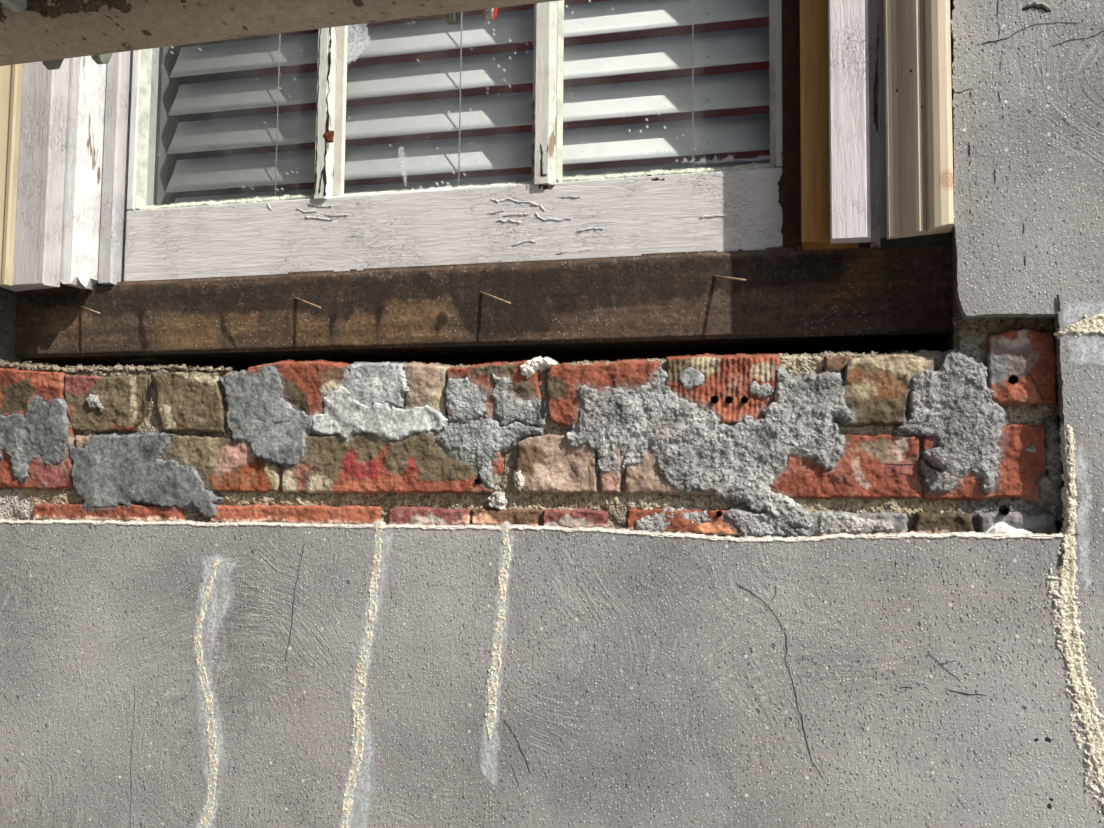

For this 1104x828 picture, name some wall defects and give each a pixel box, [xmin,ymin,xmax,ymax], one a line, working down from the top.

crack [980,0,1104,118]
flaking render [0,316,1063,538]
crack [736,583,823,778]